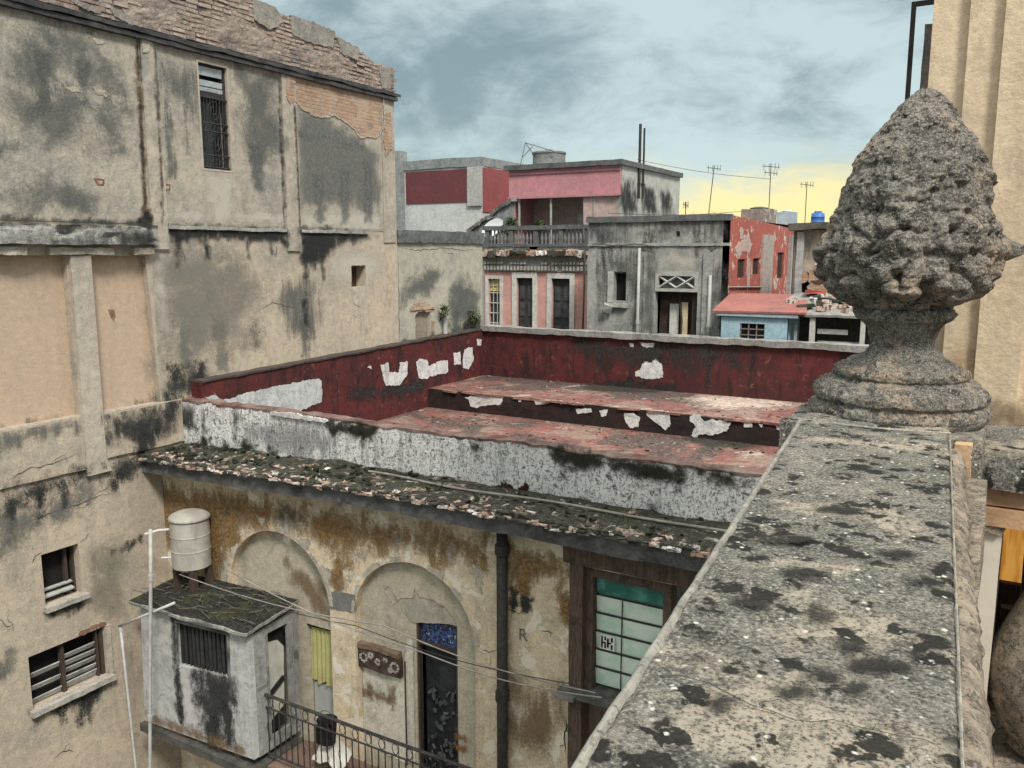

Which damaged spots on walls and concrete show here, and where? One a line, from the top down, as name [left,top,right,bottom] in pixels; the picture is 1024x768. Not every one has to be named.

flaking render [286,76,393,157]
damp [0,20,384,491]
peeling [735,227,752,291]
damp [575,180,795,410]
peeling [367,339,482,386]
peeling [629,342,663,379]
peeling [465,395,503,408]
peeling [576,402,608,417]
peeling [624,410,671,430]
damp [0,466,94,556]
damp [170,617,238,749]